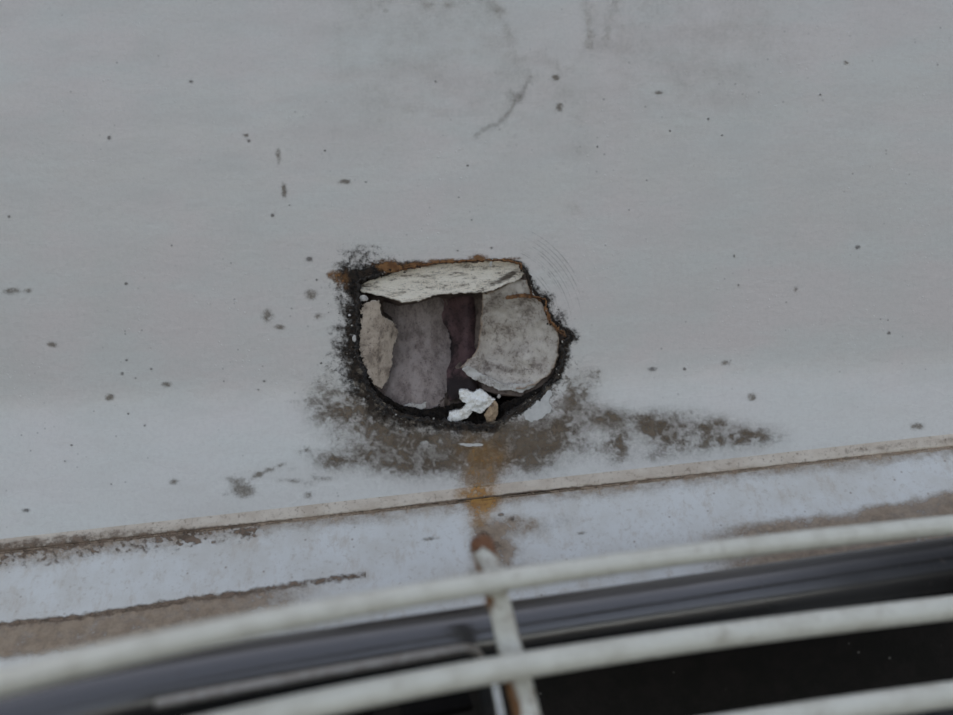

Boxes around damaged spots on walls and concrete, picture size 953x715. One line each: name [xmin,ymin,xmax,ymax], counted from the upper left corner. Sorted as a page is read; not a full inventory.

rust [376,259,457,272]
leakage [327,370,627,471]
peeling [524,390,552,422]
leakage [636,416,686,445]
leakage [699,421,768,447]
rust [461,443,504,523]